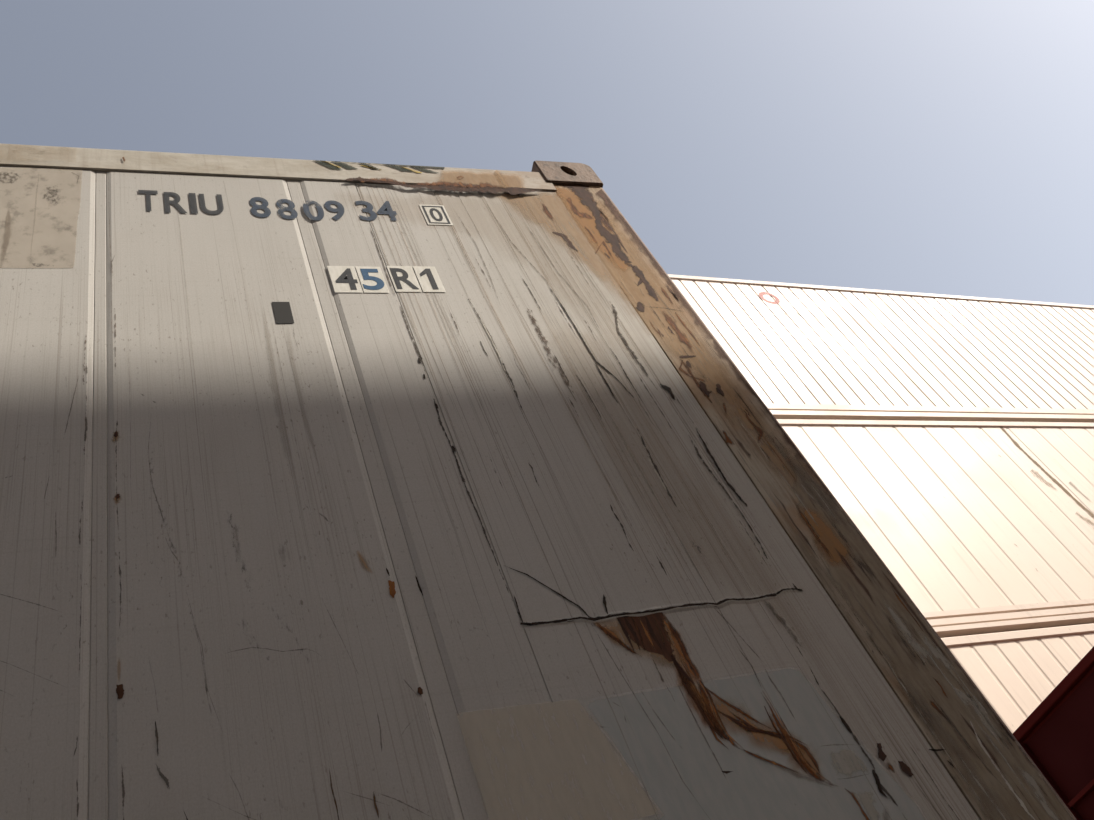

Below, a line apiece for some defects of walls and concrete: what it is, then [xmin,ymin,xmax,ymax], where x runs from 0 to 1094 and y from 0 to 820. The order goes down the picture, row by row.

crack [371,217,897,805]
corrosion [346,170,1073,820]
peeling [738,423,872,600]
peeling [884,574,1012,770]